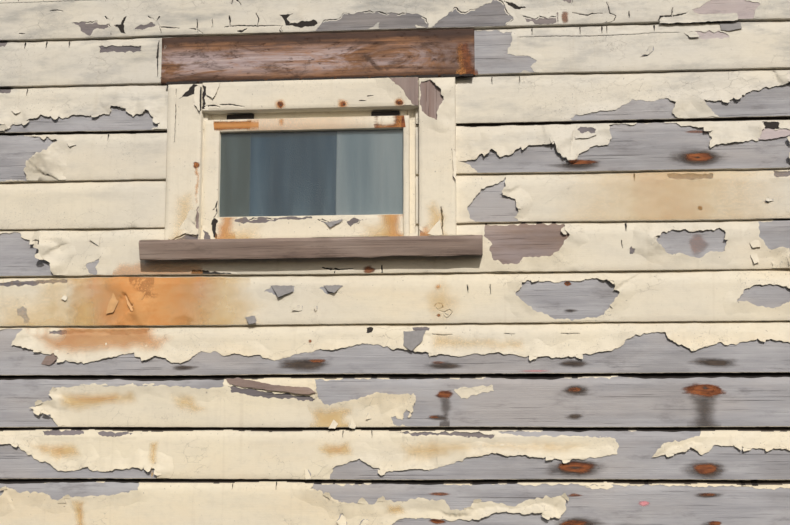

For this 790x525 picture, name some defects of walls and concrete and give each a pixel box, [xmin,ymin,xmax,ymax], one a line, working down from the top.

peeling [64,11,161,62]
peeling [660,0,768,48]
peeling [376,77,455,133]
peeling [0,83,220,182]
rust [562,160,596,168]
rust [676,151,717,165]
peeling [451,70,790,321]
rust [57,277,209,347]
peeling [0,219,790,525]
rust [684,384,725,426]
rust [551,461,597,475]
rust [691,463,722,477]